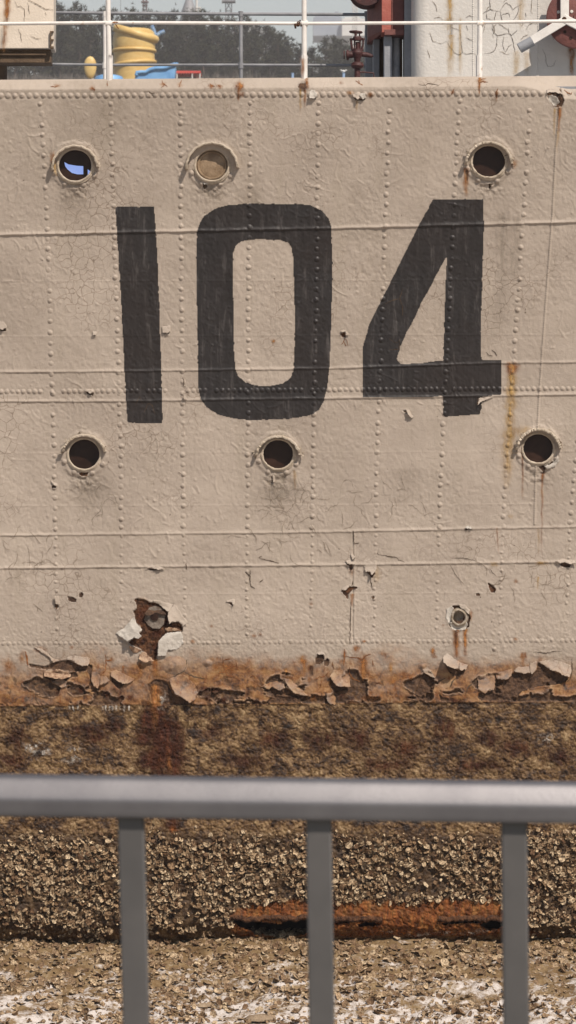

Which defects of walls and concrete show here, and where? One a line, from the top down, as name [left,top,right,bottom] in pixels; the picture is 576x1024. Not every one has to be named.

crack [428,1,552,98]
corrosion [506,363,517,465]
peeling [116,599,188,663]
corrosion [454,629,467,656]
peeling [29,647,135,693]
corrosion [136,620,184,776]
peeling [149,675,198,706]
peeling [261,678,308,703]
peeling [316,651,351,705]
peeling [477,659,572,701]
corrosion [229,899,307,936]
corrosion [333,898,502,938]